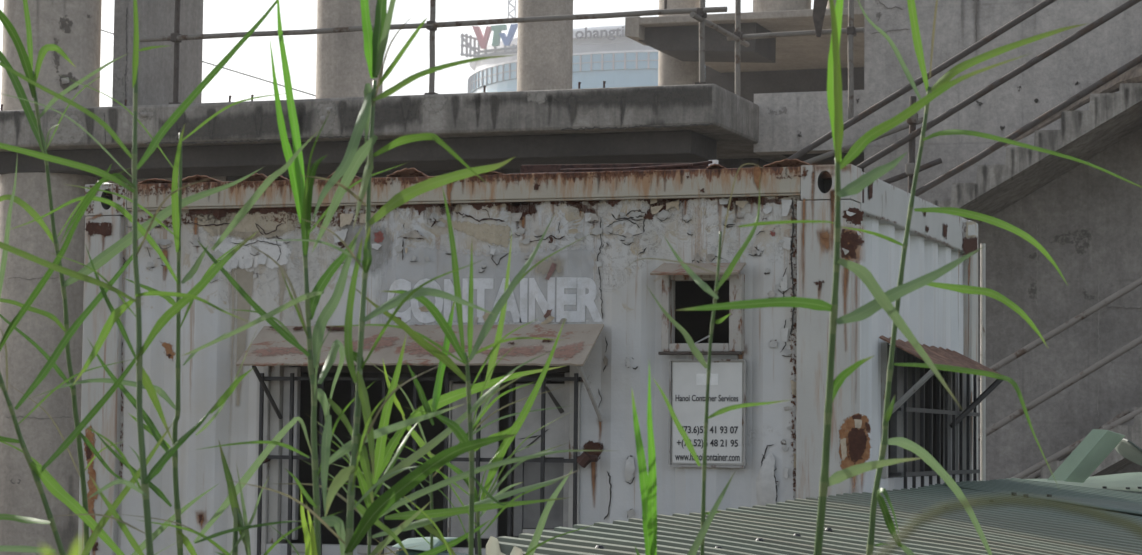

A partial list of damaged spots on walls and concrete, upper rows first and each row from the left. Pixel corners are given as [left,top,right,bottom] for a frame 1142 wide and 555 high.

peeling [126,209,301,283]
peeling [333,225,430,271]
corrosion [85,165,850,295]
peeling [511,212,560,280]
peeling [575,209,643,319]
peeling [764,196,797,357]
corrosion [819,183,897,348]
corrosion [160,342,176,360]
corrosion [83,426,98,555]
corrosion [583,421,604,501]
corrosion [838,413,872,492]